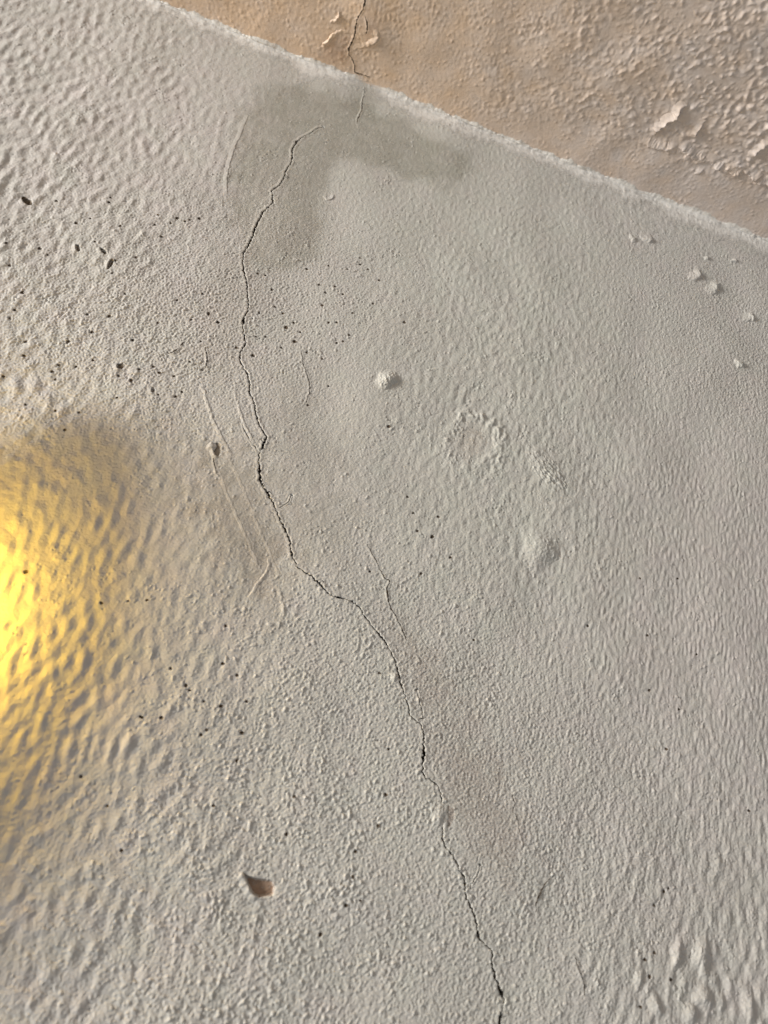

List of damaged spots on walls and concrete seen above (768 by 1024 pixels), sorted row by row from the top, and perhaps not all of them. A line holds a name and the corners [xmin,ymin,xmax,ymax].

crack [346,0,370,124]
peeling [638,101,768,186]
crack [236,125,509,1024]
peeling [236,872,275,904]